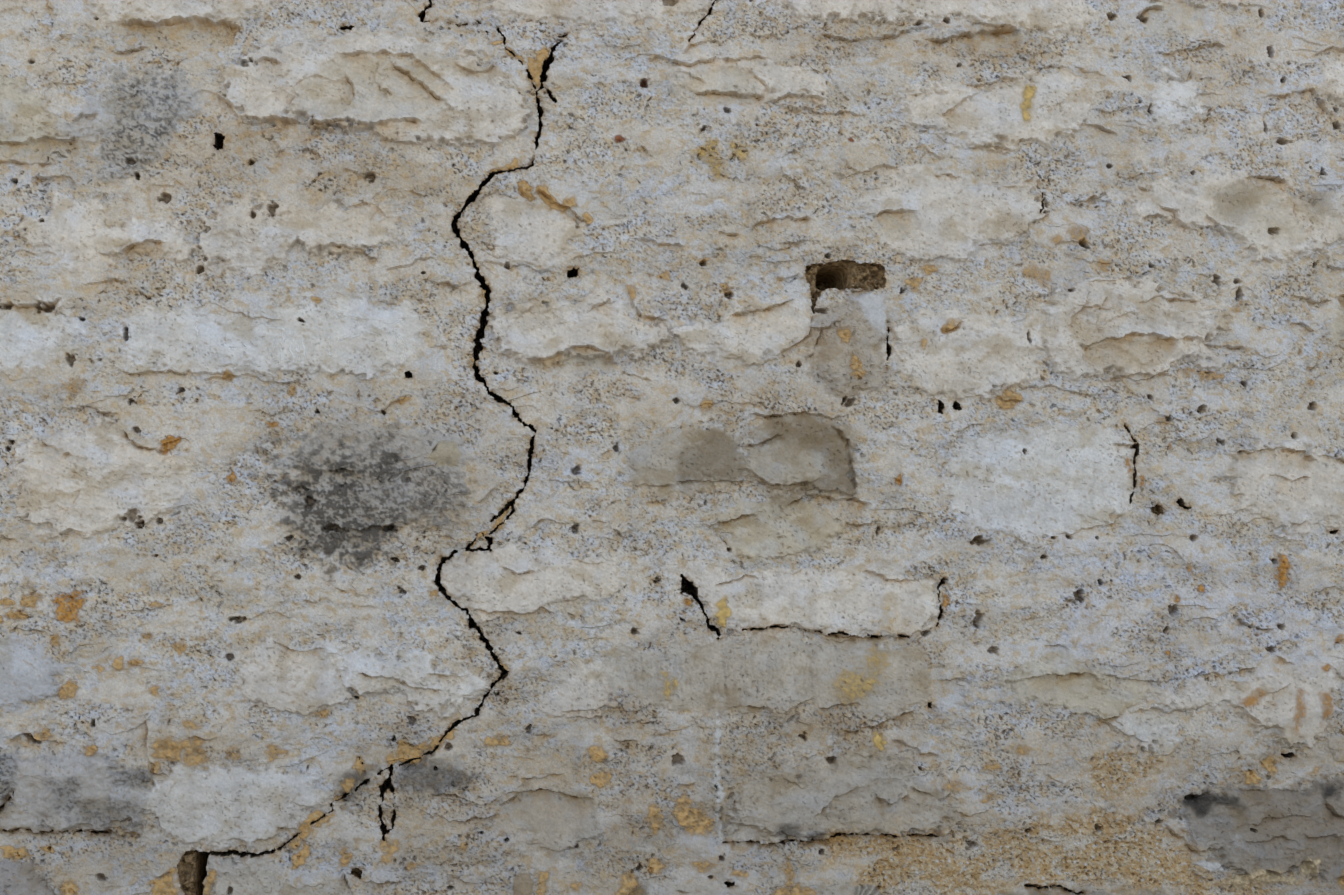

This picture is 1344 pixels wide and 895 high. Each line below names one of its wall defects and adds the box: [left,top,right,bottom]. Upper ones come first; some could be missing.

crack [688,0,717,42]
crack [210,0,568,858]
crack [680,574,946,640]